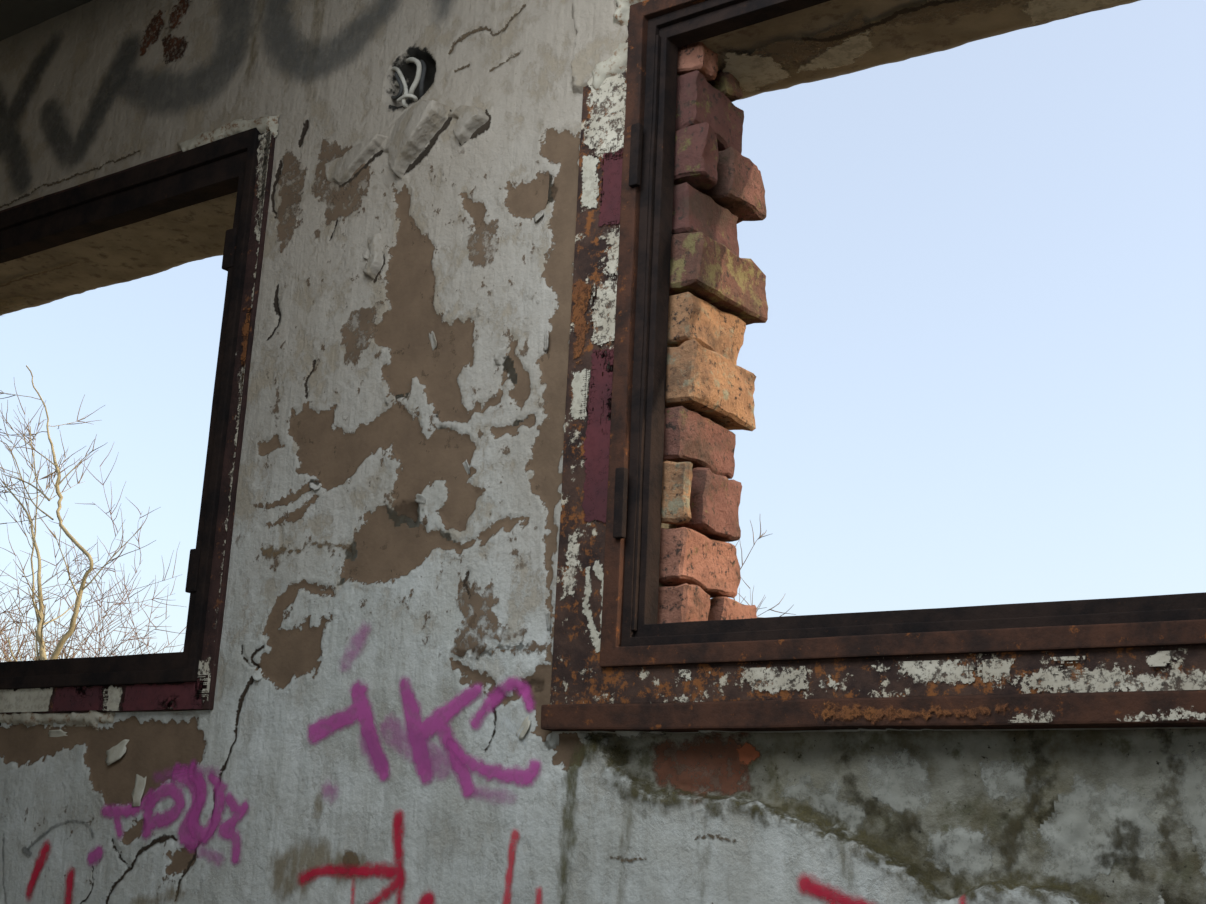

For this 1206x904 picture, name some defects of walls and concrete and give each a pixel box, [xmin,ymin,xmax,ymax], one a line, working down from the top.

water stain [741,0,1011,69]
peeling [177,114,384,593]
spalling [252,0,1206,904]
peeling [0,657,211,895]
water stain [561,732,1104,904]